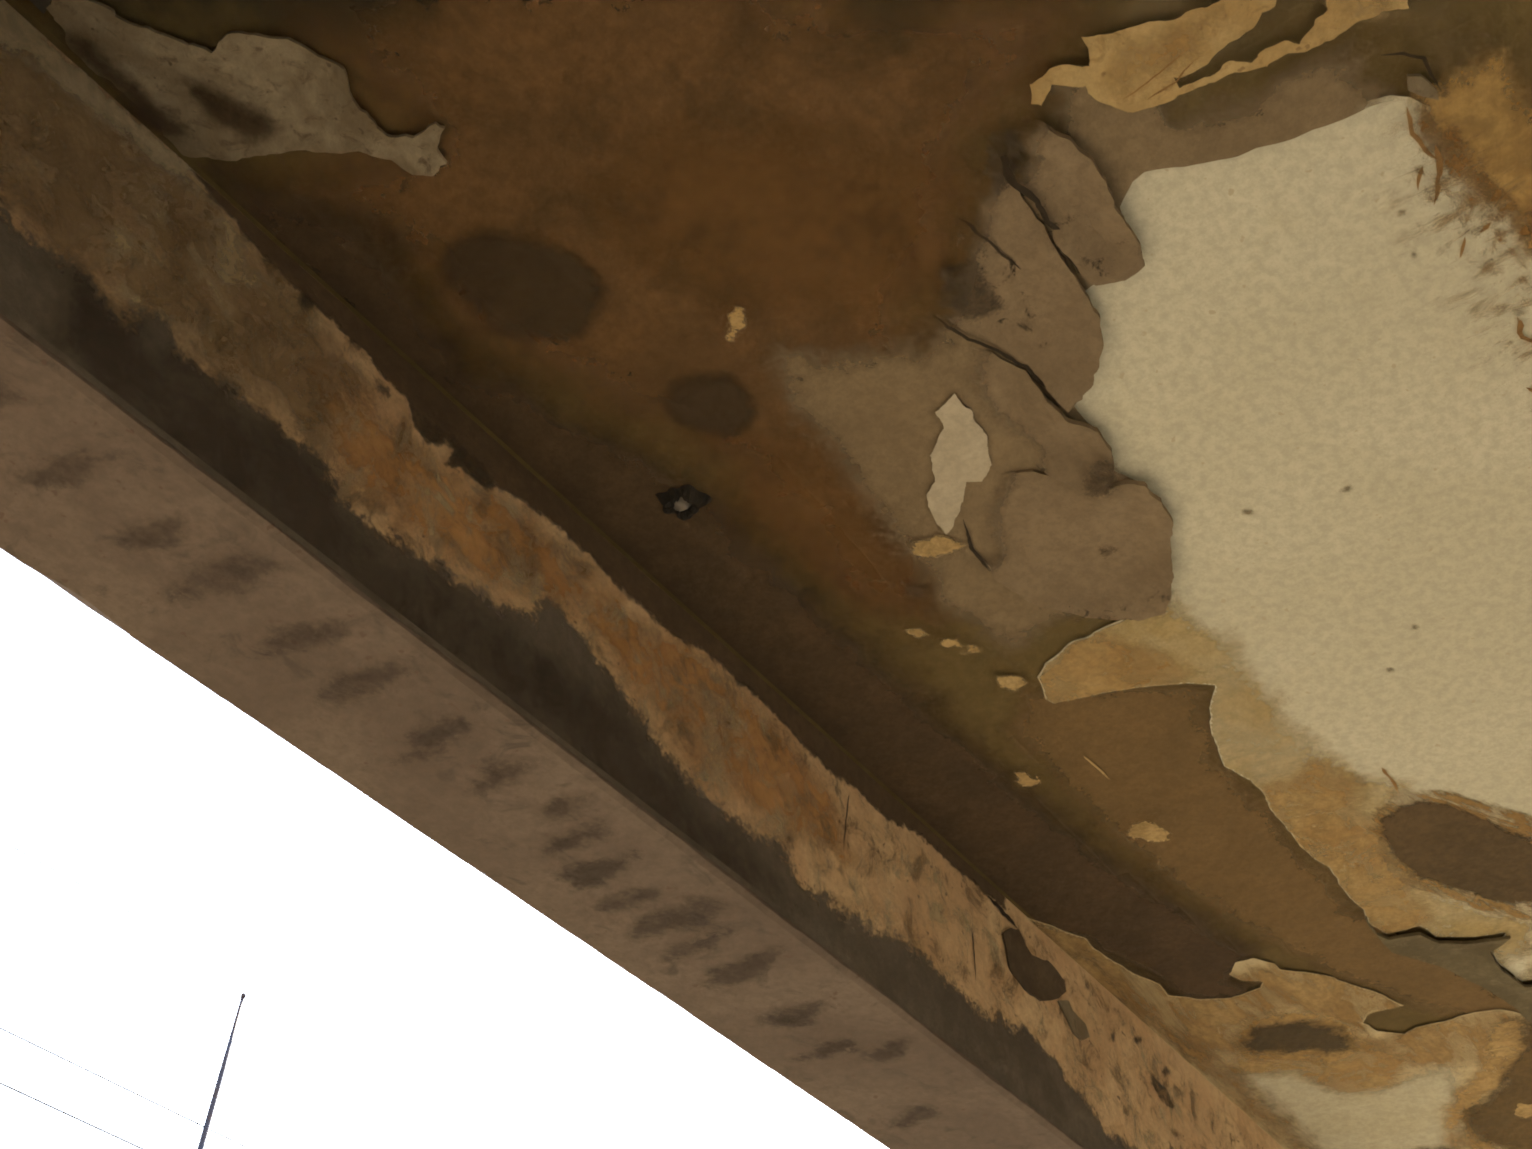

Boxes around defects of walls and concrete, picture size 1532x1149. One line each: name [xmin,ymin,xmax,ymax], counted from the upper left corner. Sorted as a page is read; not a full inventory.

peeling [0,0,448,184]
crack [958,218,1021,270]
crack [1000,155,1080,274]
rust [1406,49,1532,287]
spalling [726,307,747,341]
crack [933,315,1046,388]
rust [1494,303,1532,357]
damp [0,43,1255,1149]
spalling [773,0,1532,1149]
damp [1368,768,1532,920]
damp [1237,1012,1361,1064]
damp [1439,1020,1532,1149]